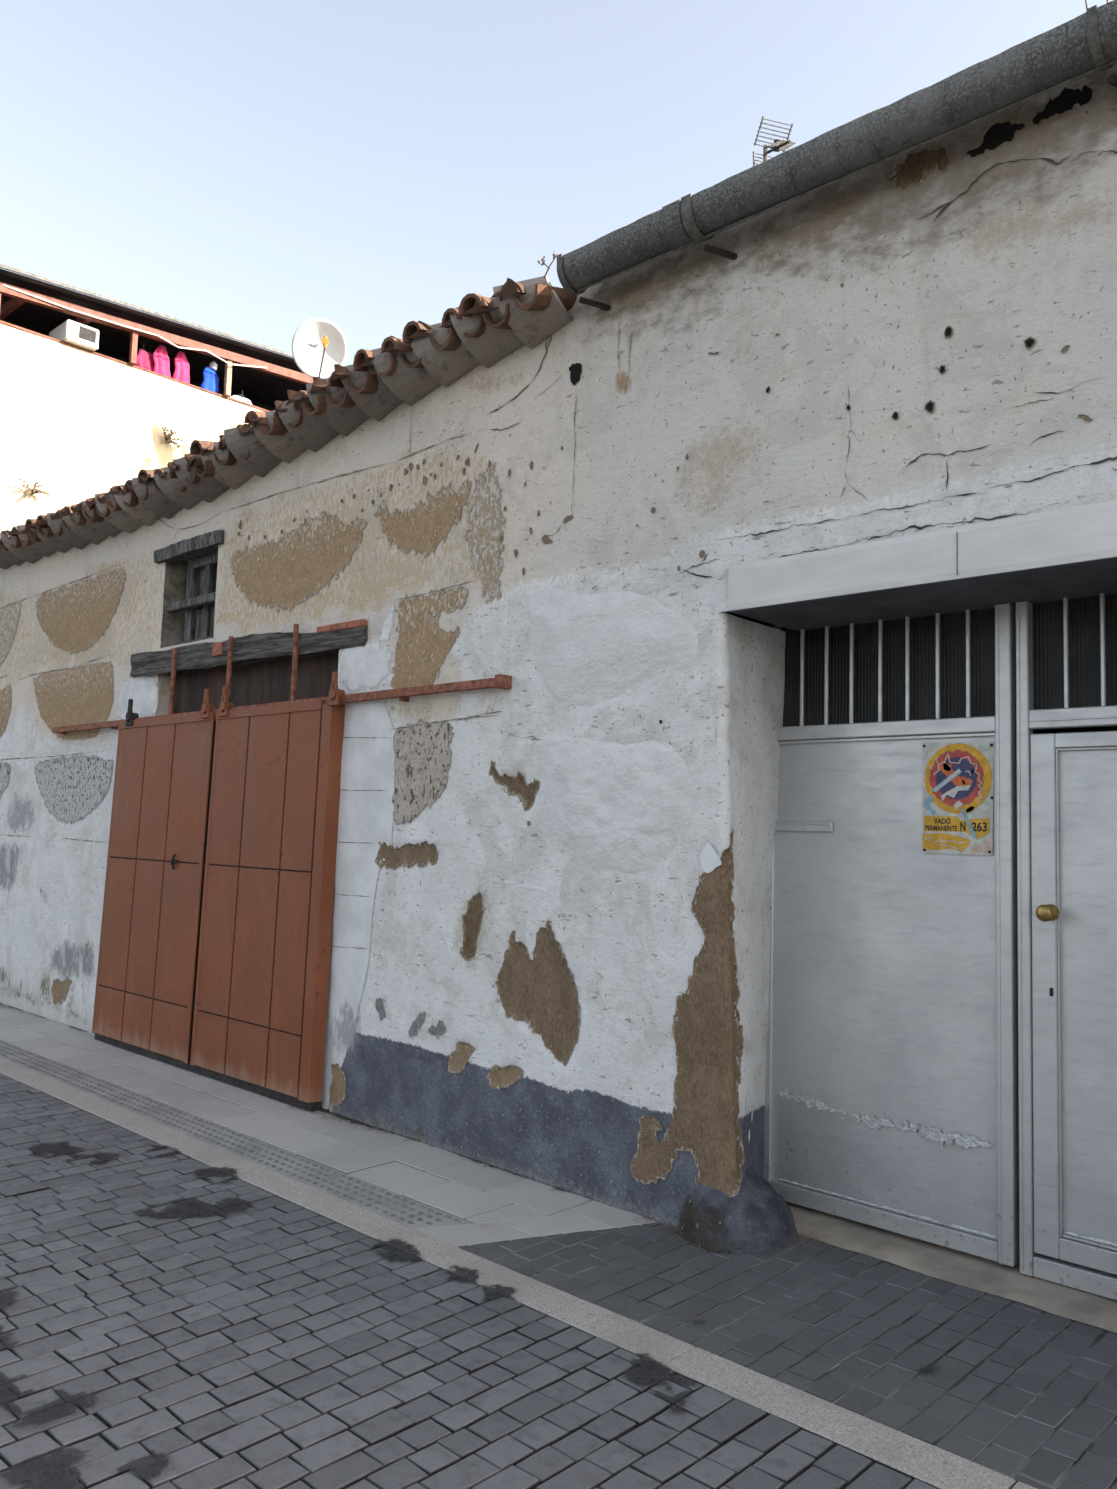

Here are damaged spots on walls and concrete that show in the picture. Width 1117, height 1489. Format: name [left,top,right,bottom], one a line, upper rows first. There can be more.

crack [917,150,1117,221]
crack [681,377,1117,578]
peeling [392,719,454,825]
spalling [489,760,539,826]
spalling [375,841,438,870]
spalling [492,918,580,1066]
spalling [630,828,753,1254]
water stain [148,1145,182,1157]
water stain [134,1167,253,1220]
water stain [0,1288,18,1308]
water stain [0,1371,100,1426]
water stain [0,1446,88,1489]